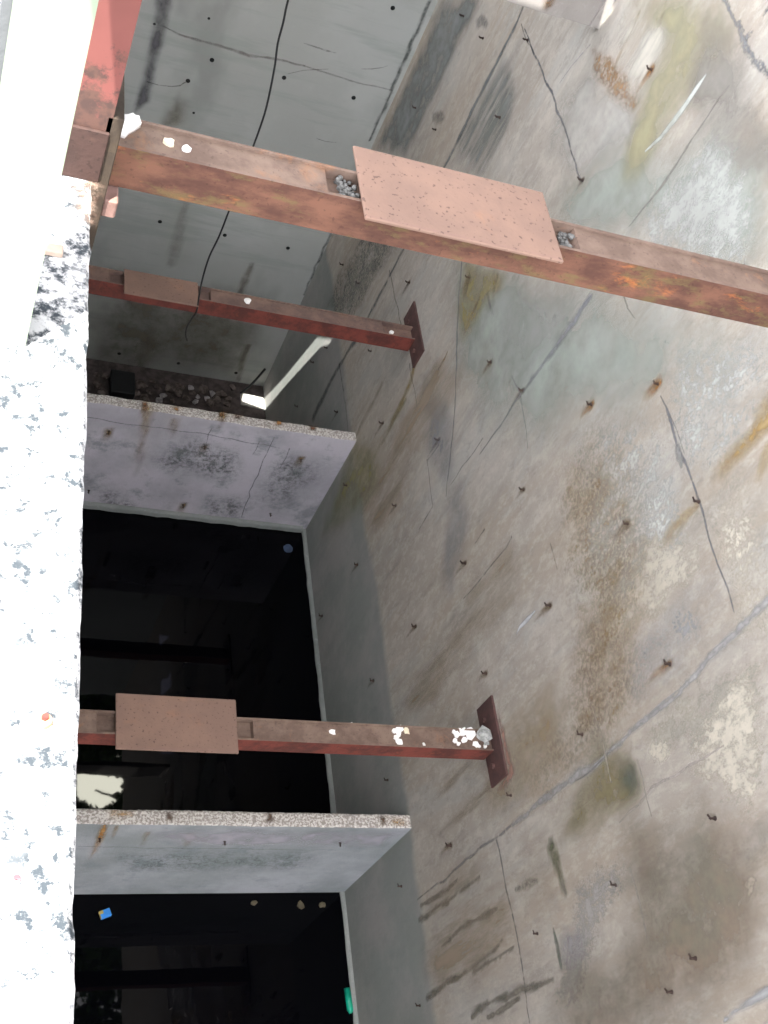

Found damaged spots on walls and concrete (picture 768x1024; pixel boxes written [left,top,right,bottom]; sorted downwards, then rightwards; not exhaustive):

leakage [137,0,169,107]
crack [521,24,581,181]
leakage [559,18,663,168]
leakage [162,445,232,473]
crack [660,396,734,612]